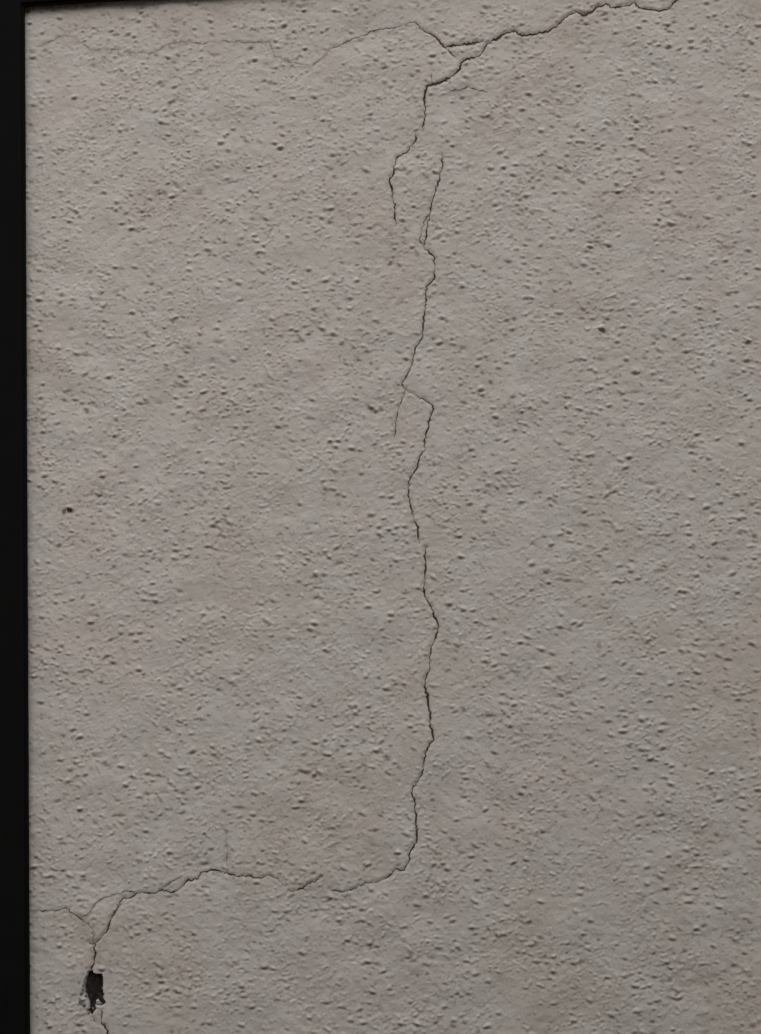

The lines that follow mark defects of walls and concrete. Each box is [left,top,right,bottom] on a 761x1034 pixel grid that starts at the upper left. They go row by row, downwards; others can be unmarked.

crack [34,0,678,969]
hole [78,970,105,1014]